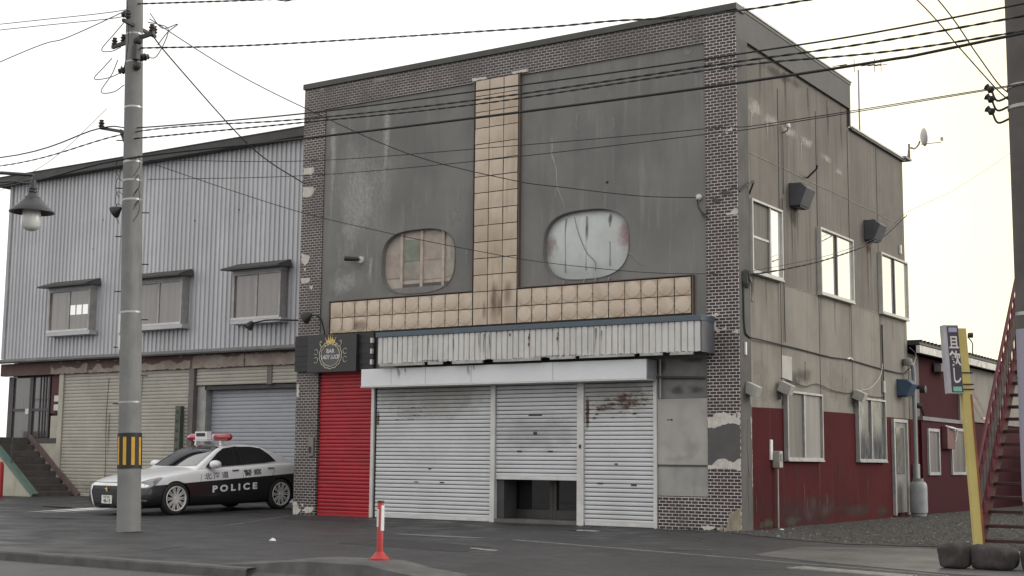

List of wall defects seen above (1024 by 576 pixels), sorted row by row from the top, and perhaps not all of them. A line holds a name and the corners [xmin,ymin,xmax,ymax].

spalling [303,167,316,198]
damp [331,115,390,242]
spalling [301,253,313,290]
rust [586,394,646,424]
spalling [707,395,752,440]